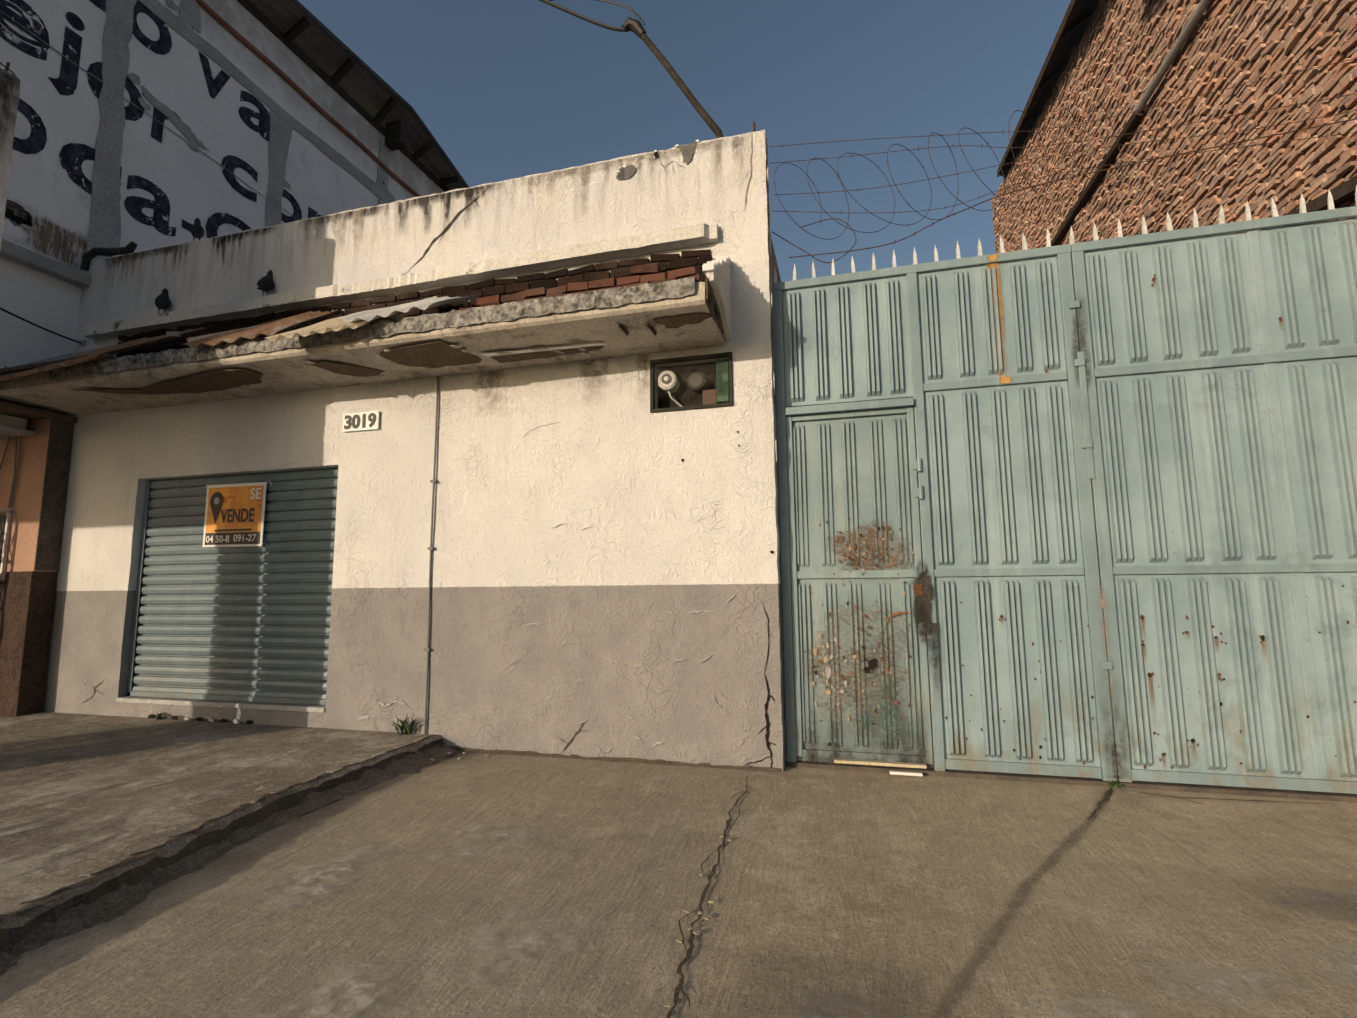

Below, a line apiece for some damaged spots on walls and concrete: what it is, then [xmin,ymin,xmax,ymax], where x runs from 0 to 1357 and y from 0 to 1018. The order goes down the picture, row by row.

damp [306,184,494,225]
damp [107,244,187,268]
damp [213,227,271,258]
crack [402,187,488,275]
flaking render [116,249,732,358]
rust [987,254,1011,384]
spalling [306,341,606,379]
spalling [71,369,264,396]
rust [819,518,915,586]
crack [558,722,584,754]
crack [656,598,775,1018]